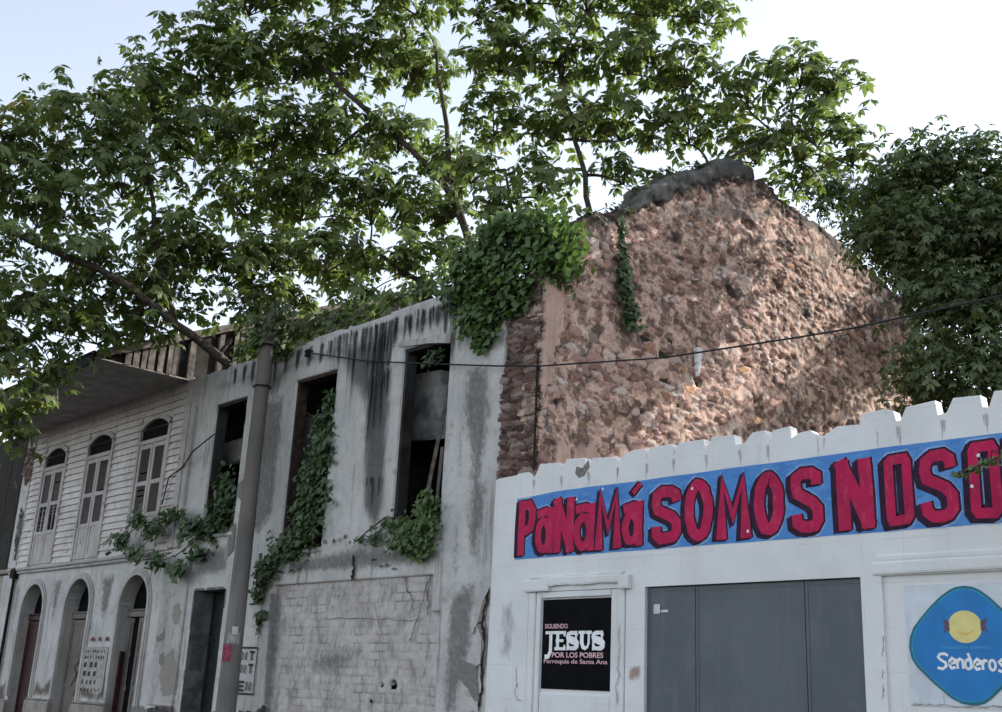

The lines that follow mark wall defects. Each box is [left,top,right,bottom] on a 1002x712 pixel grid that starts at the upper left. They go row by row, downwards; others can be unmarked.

water stain [231,362,255,382]
water stain [255,302,463,532]
water stain [466,370,486,545]
flaking render [129,631,177,712]
crack [323,575,431,700]
flaking render [457,599,487,712]
crack [473,588,490,712]